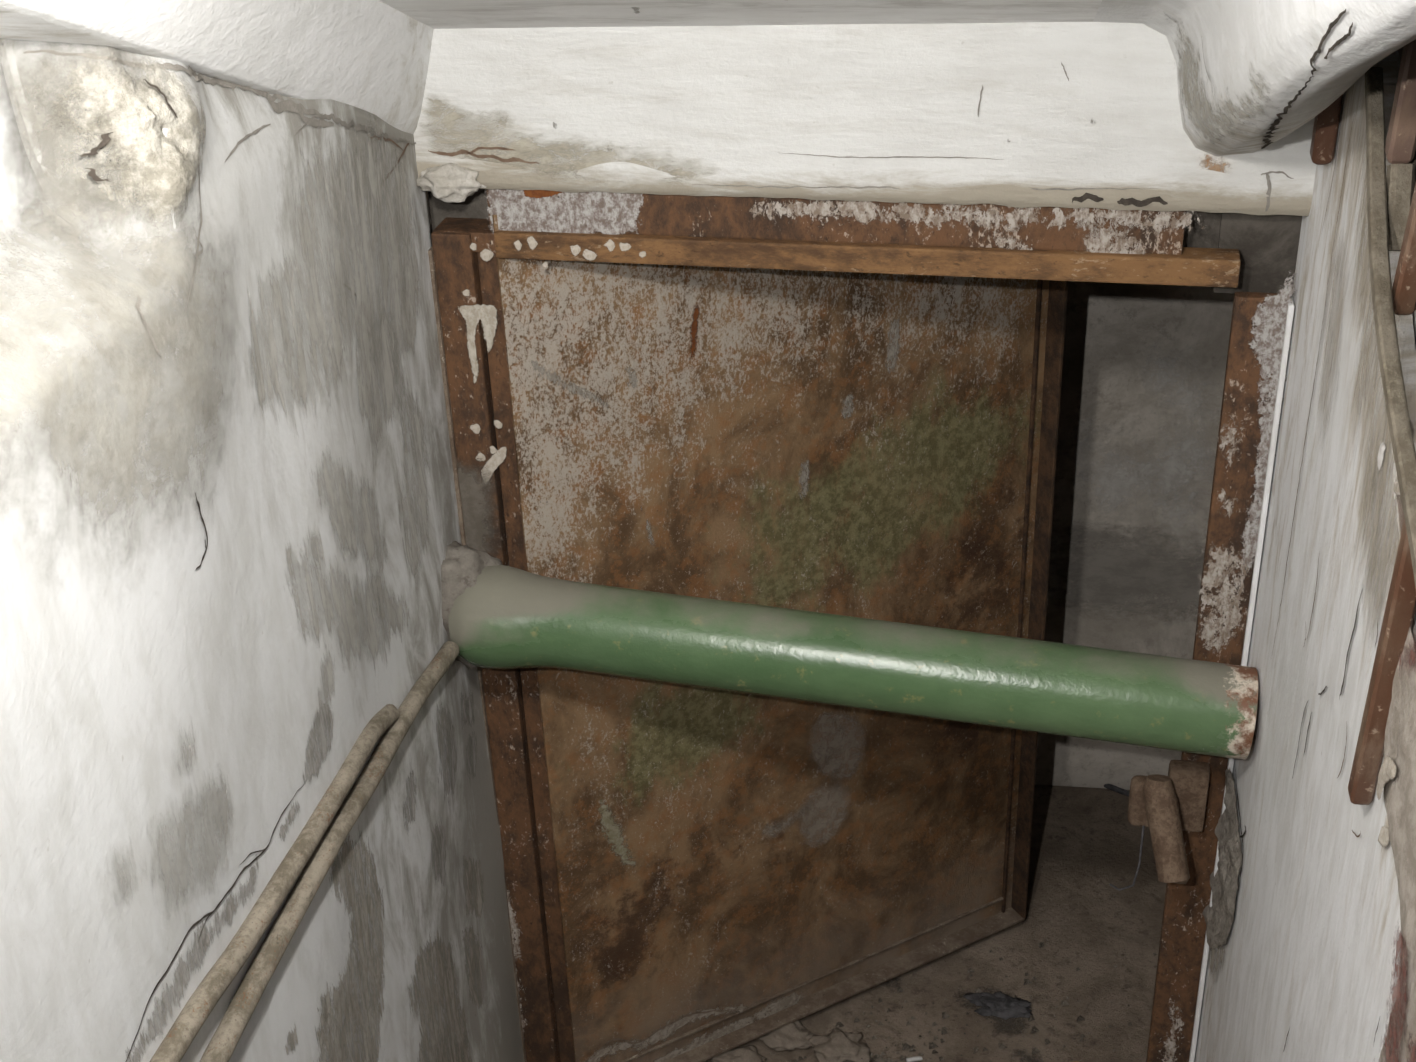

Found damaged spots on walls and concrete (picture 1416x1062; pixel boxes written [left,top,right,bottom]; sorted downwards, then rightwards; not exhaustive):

water stain [0,63,229,528]
crack [24,50,539,315]
water stain [249,137,429,577]
water stain [286,454,410,724]
peeling [458,289,498,383]
water stain [427,99,695,178]
peeling [485,189,646,261]
rust [689,305,700,360]
peeling [749,197,1204,254]
peeling [1196,271,1297,658]
crack [1261,9,1353,211]
crack [126,778,308,1061]